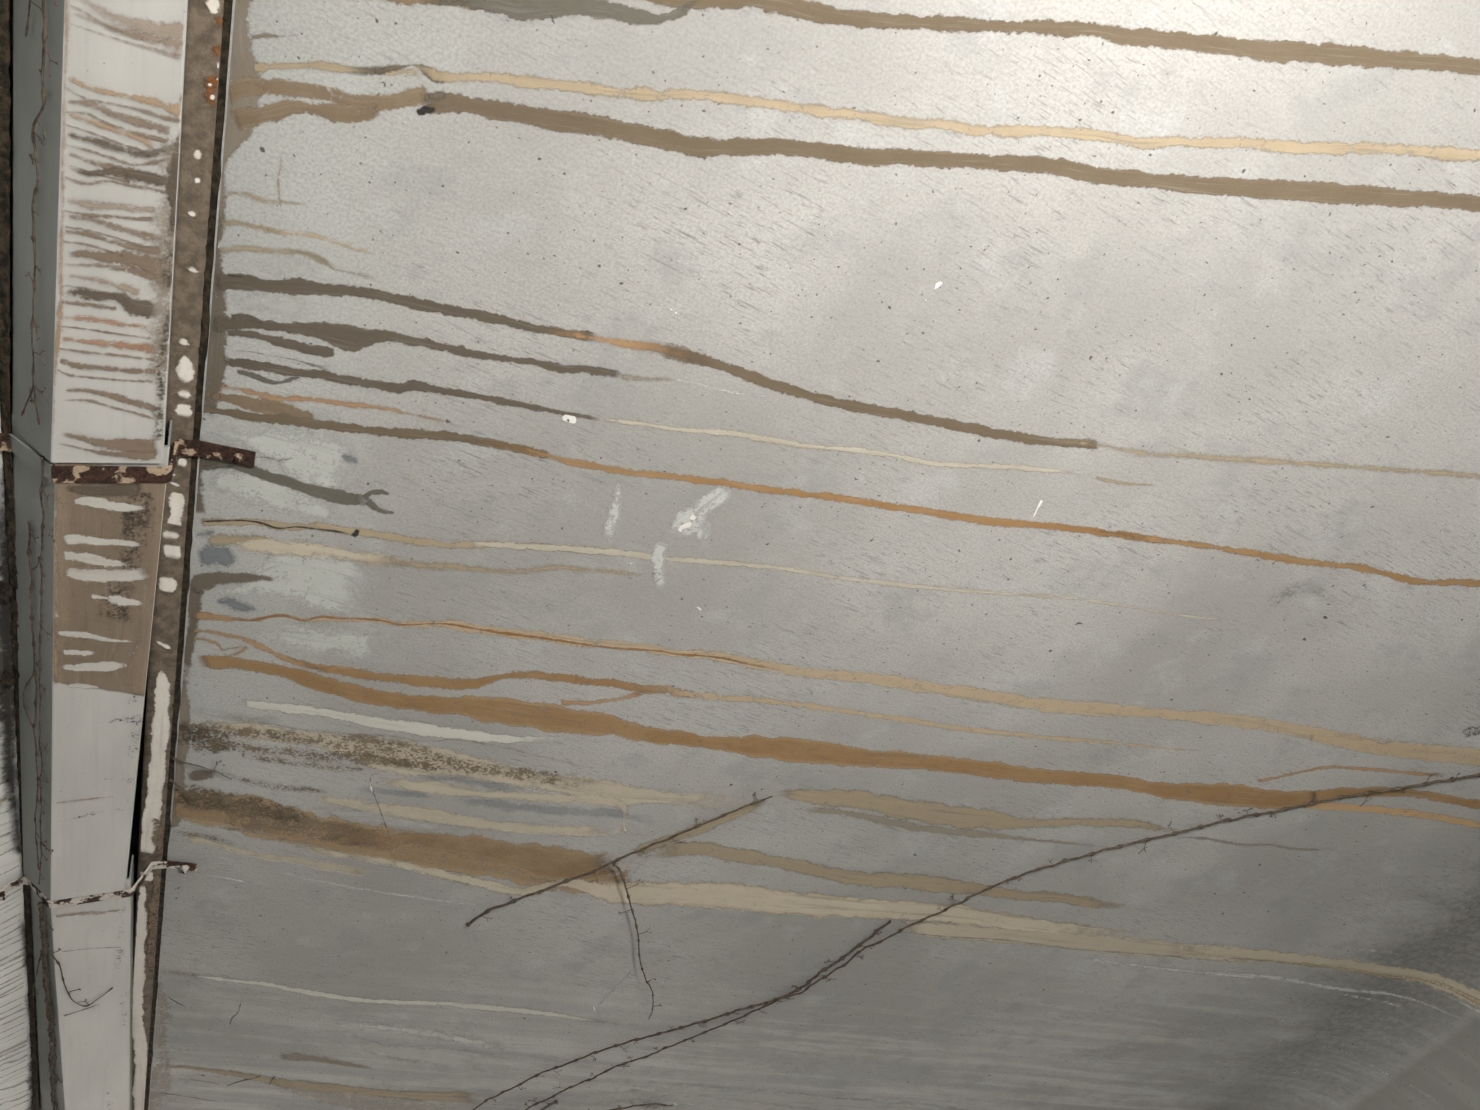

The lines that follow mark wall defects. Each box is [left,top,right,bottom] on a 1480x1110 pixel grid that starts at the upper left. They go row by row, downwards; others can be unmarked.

leakage [204,0,1067,473]
peeling [163,458,187,558]
leakage [196,457,394,514]
peeling [158,577,177,592]
peeling [140,671,171,853]
leakage [171,531,1480,1013]
leakage [177,972,601,1022]